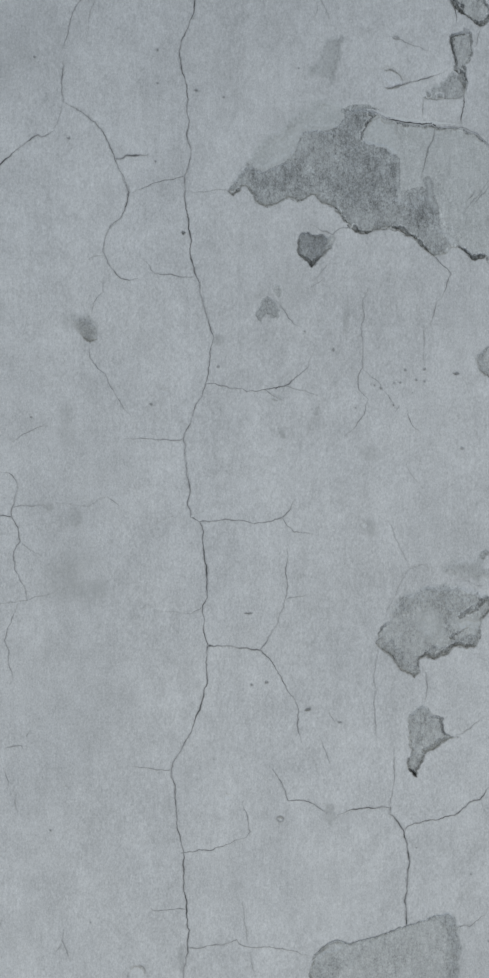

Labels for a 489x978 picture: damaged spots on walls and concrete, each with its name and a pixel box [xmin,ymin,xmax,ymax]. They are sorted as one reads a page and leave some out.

flaking render [422,0,489,102]
flaking render [225,29,489,269]
crack [375,72,489,178]
crack [344,289,421,436]
crack [423,257,452,364]
flaking render [474,345,489,378]
crack [0,0,337,978]
flaking render [374,547,489,680]
crack [267,649,489,926]
flaking render [405,702,460,778]
flaking render [307,908,468,978]